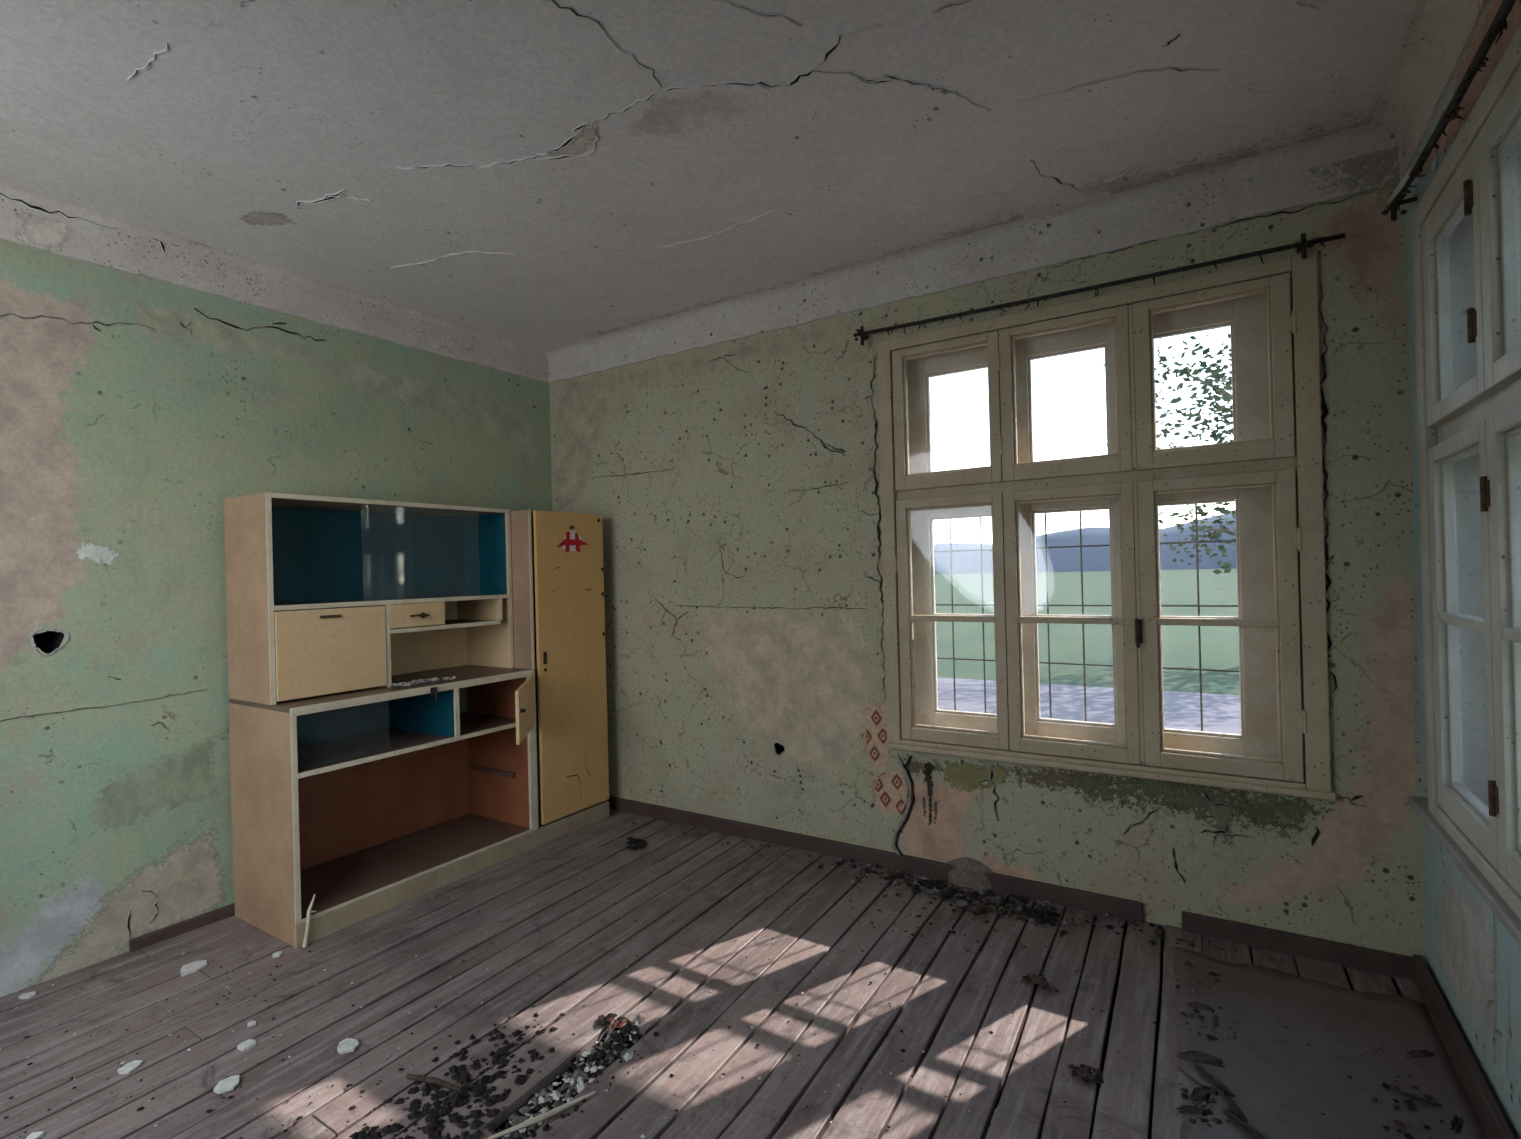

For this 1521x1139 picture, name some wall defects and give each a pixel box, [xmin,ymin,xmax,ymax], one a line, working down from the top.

crack [395,0,1221,170]
crack [296,189,370,207]
crack [1030,160,1078,190]
crack [0,308,327,342]
peeling [0,246,887,703]
crack [652,340,886,699]
crack [1318,284,1366,807]
peeling [662,567,1068,887]
damp [900,753,1336,845]
crack [1122,788,1269,884]
crack [1311,826,1321,846]